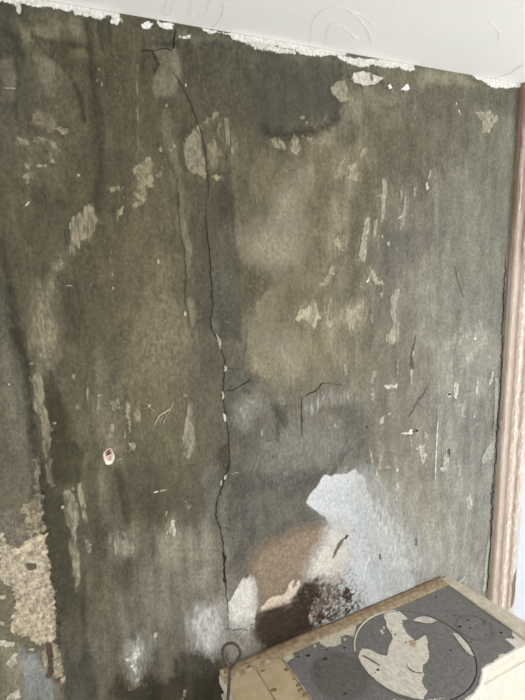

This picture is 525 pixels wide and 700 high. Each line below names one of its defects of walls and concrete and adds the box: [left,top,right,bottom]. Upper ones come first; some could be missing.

peeling [141,20,174,29]
peeling [247,40,296,54]
peeling [352,71,392,89]
crack [140,2,250,631]
damp [4,268,71,648]
damp [77,483,88,521]
flaking render [0,458,63,668]
peeling [305,469,426,626]
peeling [187,573,259,656]
damp [125,640,141,675]